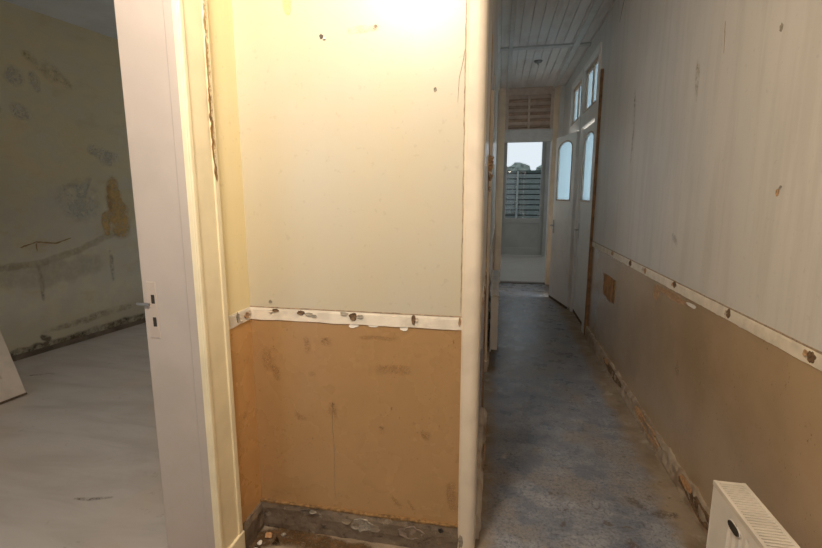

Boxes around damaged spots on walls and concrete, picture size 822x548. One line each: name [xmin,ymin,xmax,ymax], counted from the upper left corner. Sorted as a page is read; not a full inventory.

crack [203,4,218,181]